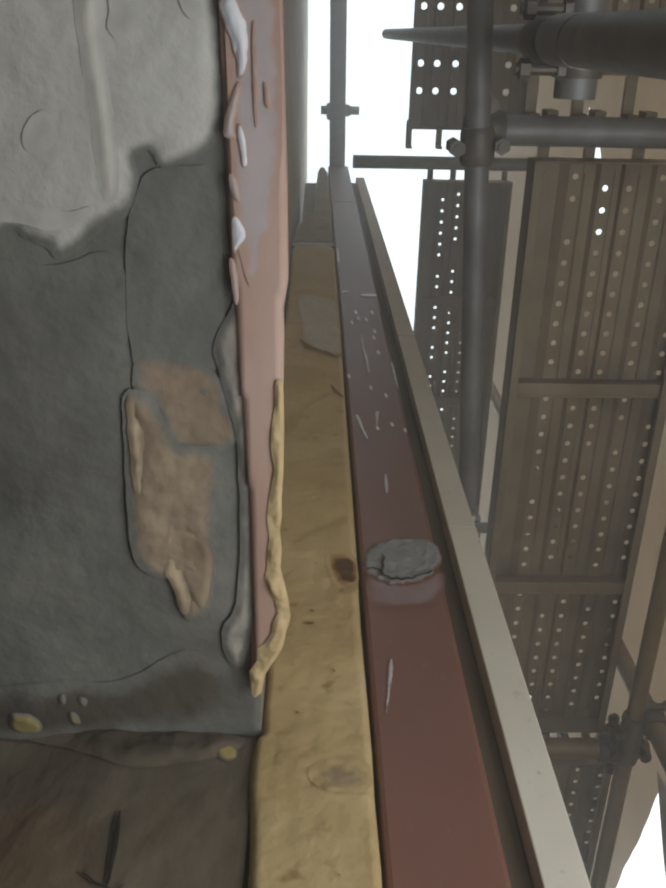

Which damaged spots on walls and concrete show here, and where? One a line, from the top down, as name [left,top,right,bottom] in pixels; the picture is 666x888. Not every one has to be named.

peeling [0,0,282,305]
spalling [122,353,236,622]
crack [78,809,125,888]